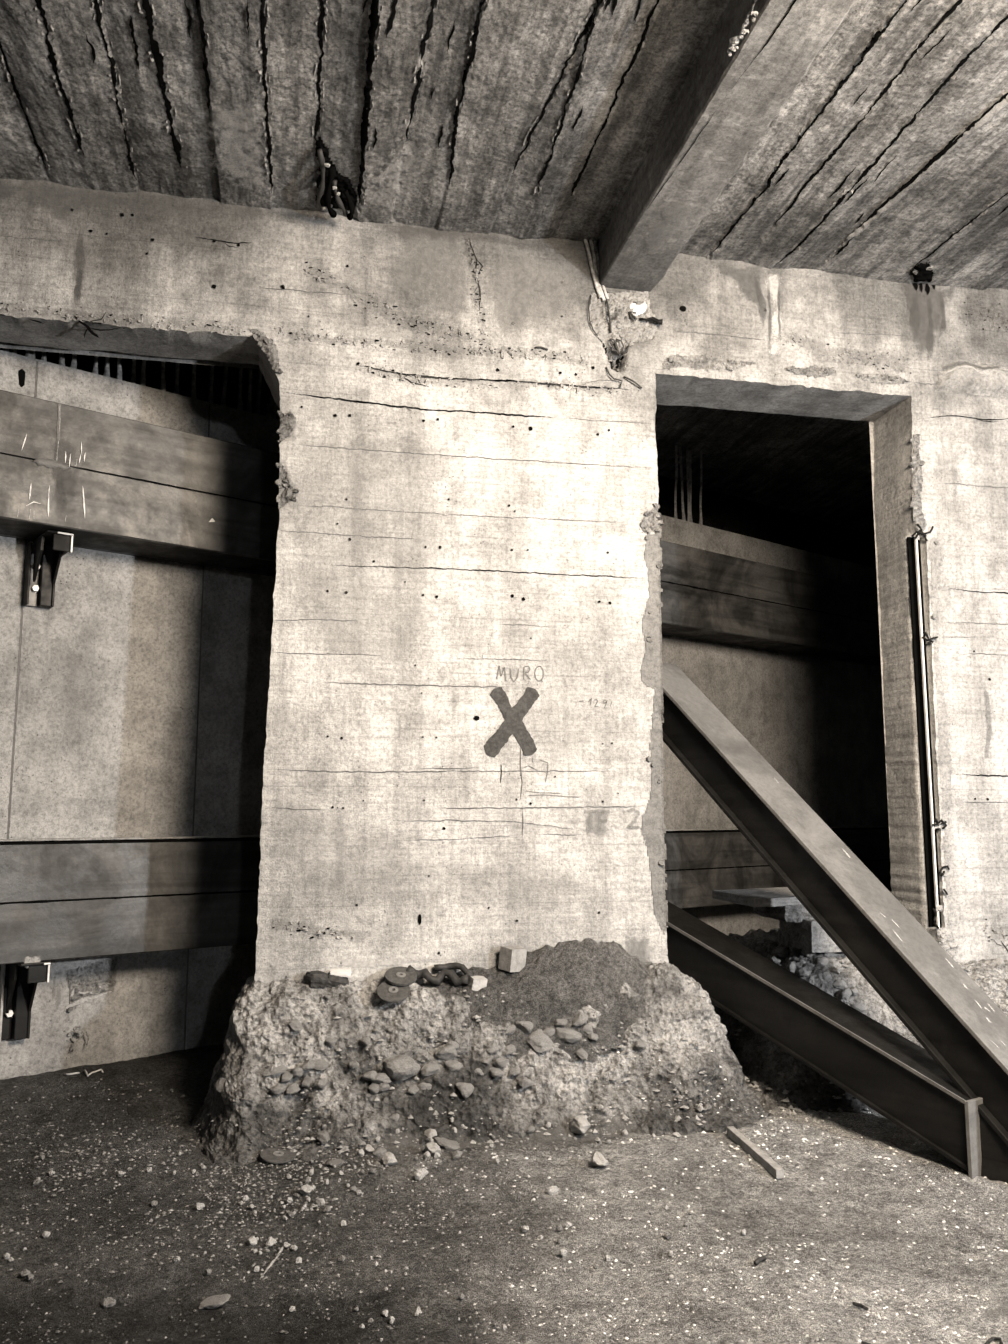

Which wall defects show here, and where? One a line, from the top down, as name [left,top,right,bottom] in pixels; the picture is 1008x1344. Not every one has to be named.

crack [0,0,213,180]
crack [246,0,276,193]
crack [312,0,328,145]
crack [354,0,490,205]
crack [636,0,797,225]
spalling [727,0,759,56]
crack [711,0,1008,270]
spalling [276,411,296,442]
spalling [274,463,299,509]
spalling [603,339,628,372]
peeling [640,503,668,935]